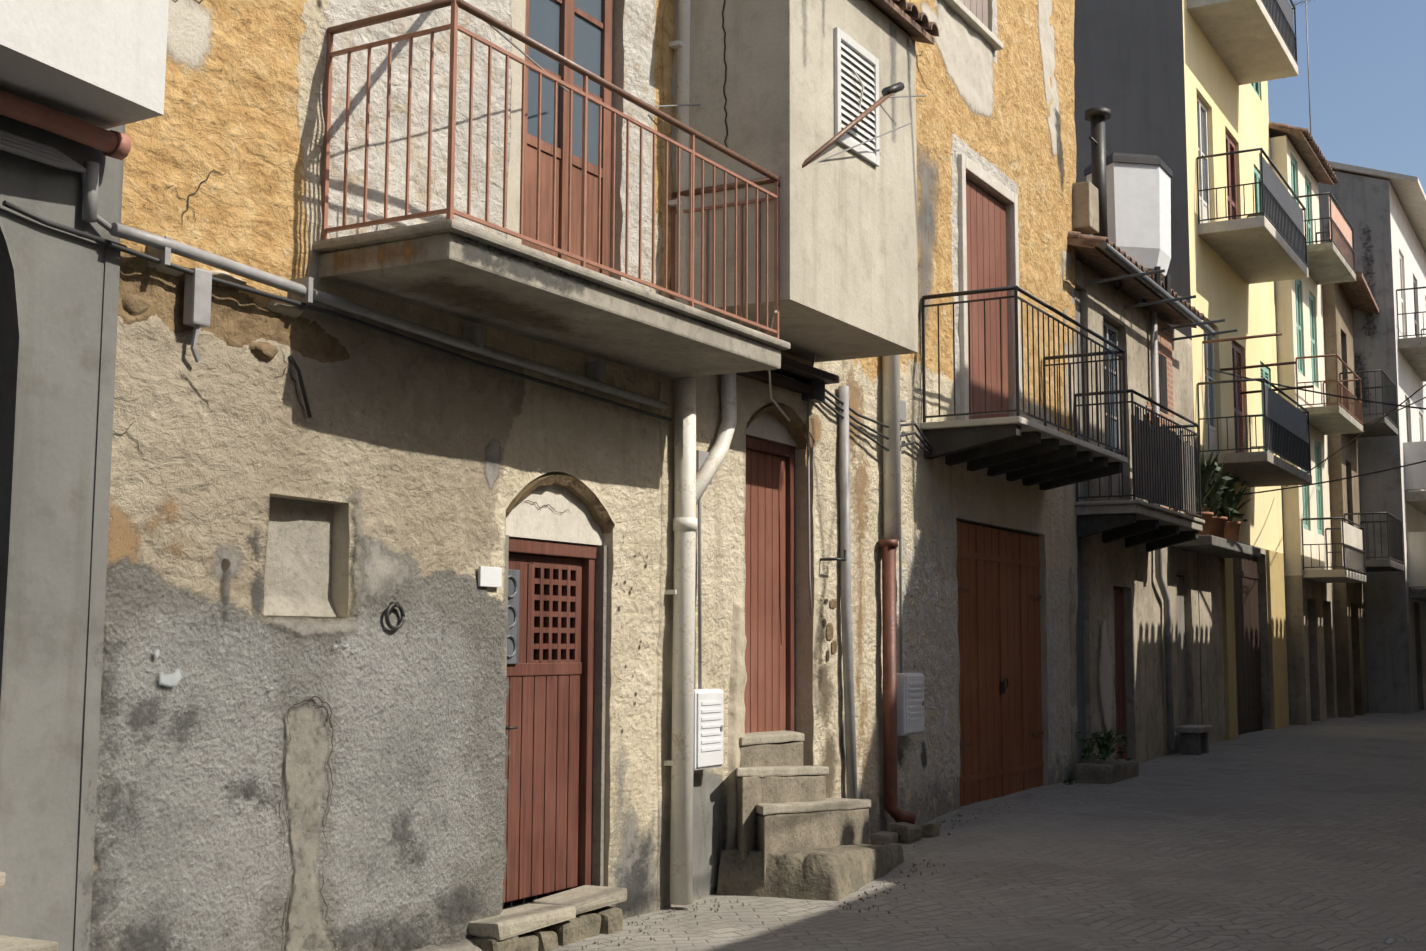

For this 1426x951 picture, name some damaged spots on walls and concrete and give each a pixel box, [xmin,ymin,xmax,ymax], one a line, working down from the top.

flaking render [167,0,212,70]
crack [721,0,729,148]
flaking render [921,1,994,117]
crack [163,169,225,225]
flaking render [118,253,350,363]
crack [179,369,212,412]
flaking render [107,499,177,565]
peeling [268,491,414,651]
flaking render [282,696,339,951]